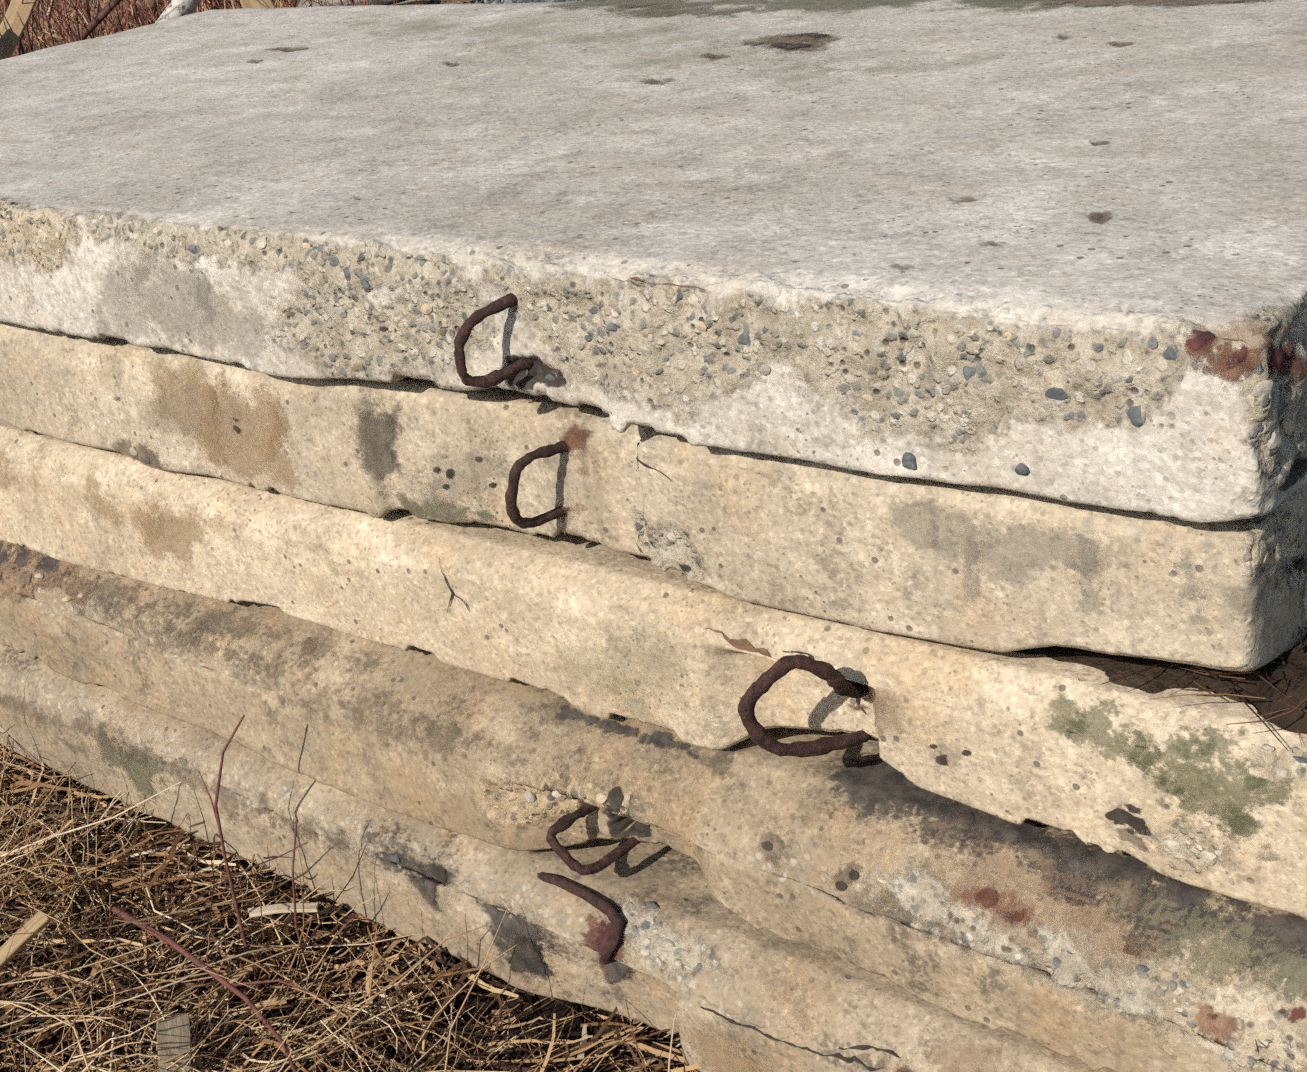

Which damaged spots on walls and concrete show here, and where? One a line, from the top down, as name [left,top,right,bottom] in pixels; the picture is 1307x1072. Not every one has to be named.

spalling [482,268,1307,491]
corrosion [1185,330,1307,382]
corrosion [560,424,592,451]
spalling [433,455,453,489]
corrosion [949,885,1030,929]
corrosion [582,915,632,985]